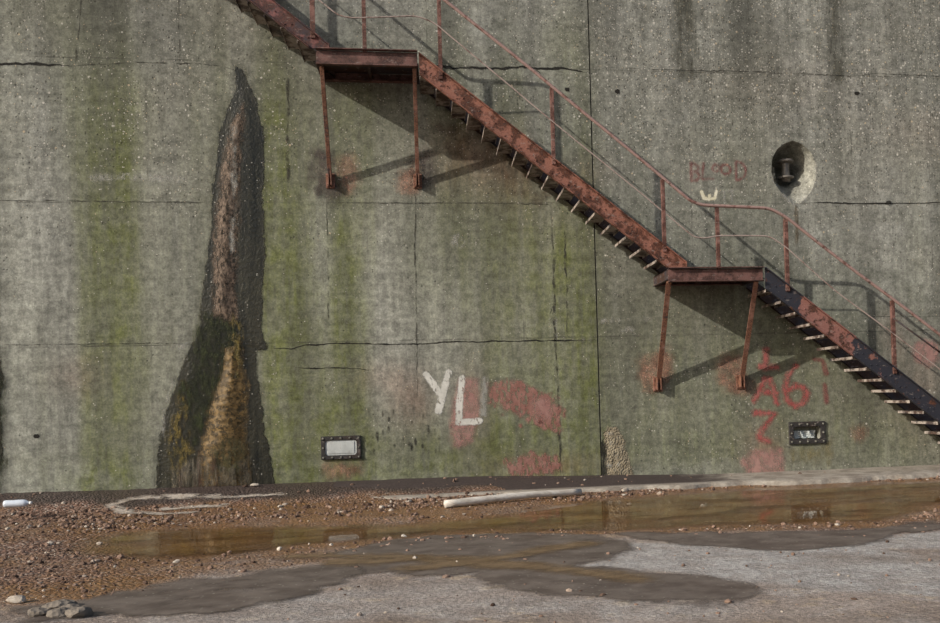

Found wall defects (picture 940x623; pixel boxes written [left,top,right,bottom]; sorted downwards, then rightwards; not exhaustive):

crack [0,0,230,69]
crack [437,65,582,73]
crack [652,67,764,75]
crack [815,199,940,207]
water stain [104,67,284,515]
crack [275,196,579,469]
spalling [600,427,633,475]